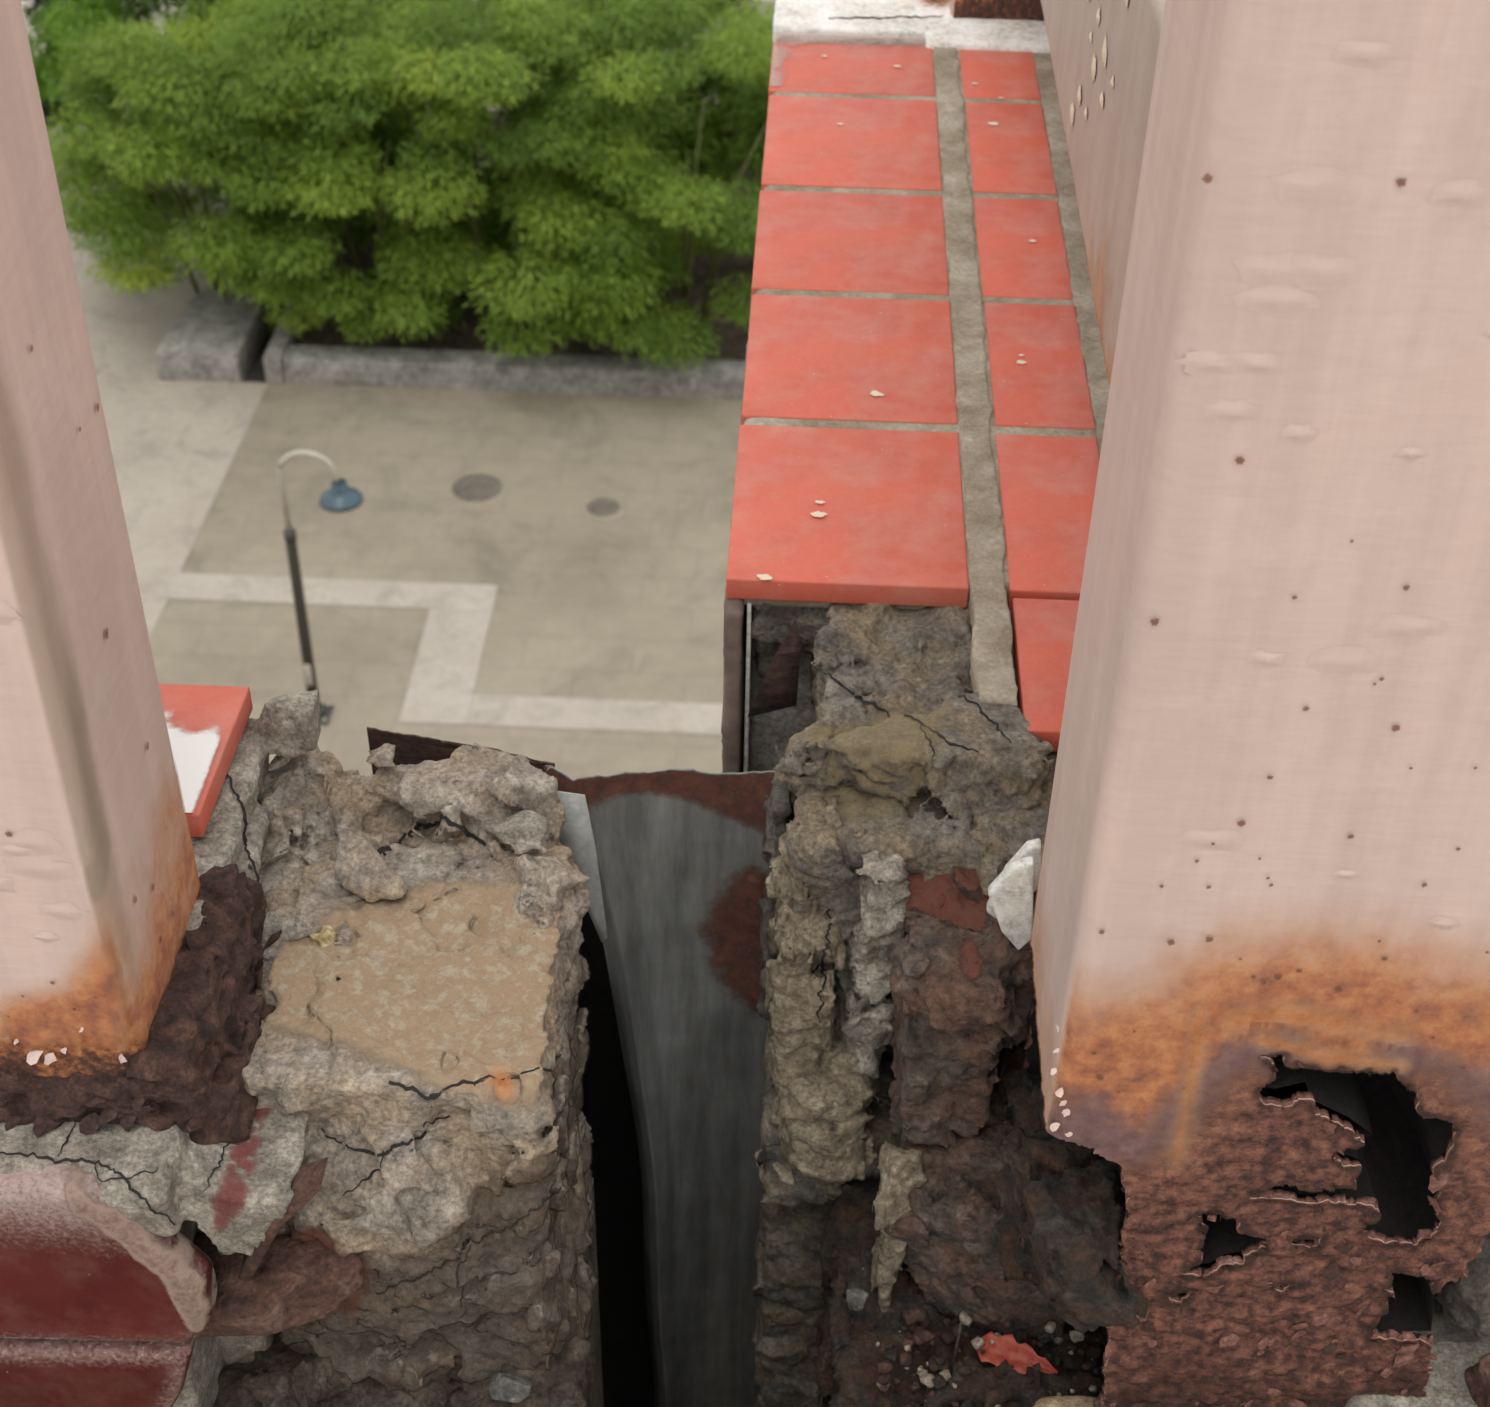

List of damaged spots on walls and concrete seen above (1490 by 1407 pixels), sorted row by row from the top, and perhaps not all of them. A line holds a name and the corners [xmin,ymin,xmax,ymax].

rust [923,0,1044,21]
crack [824,672,1012,758]
rust [543,766,775,834]
rust [0,805,282,1145]
spalling [261,878,561,1111]
rust [701,866,767,1012]
spalling [905,838,1041,950]
crack [0,1123,176,1226]
crack [203,1143,230,1191]
crack [321,1067,553,1196]
peeling [1050,1025,1073,1137]
rust [1048,937,1490,1407]